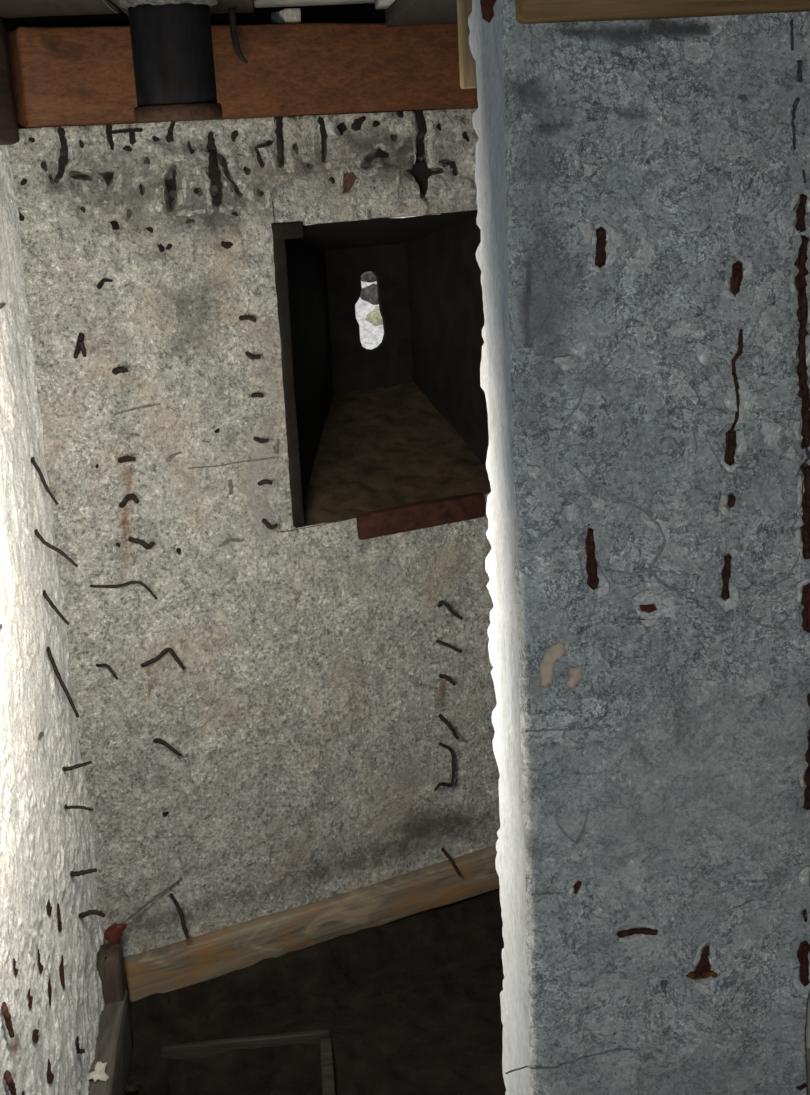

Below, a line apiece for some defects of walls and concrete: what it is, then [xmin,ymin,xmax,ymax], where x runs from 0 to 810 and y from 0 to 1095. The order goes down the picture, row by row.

peeling [540,642,564,687]